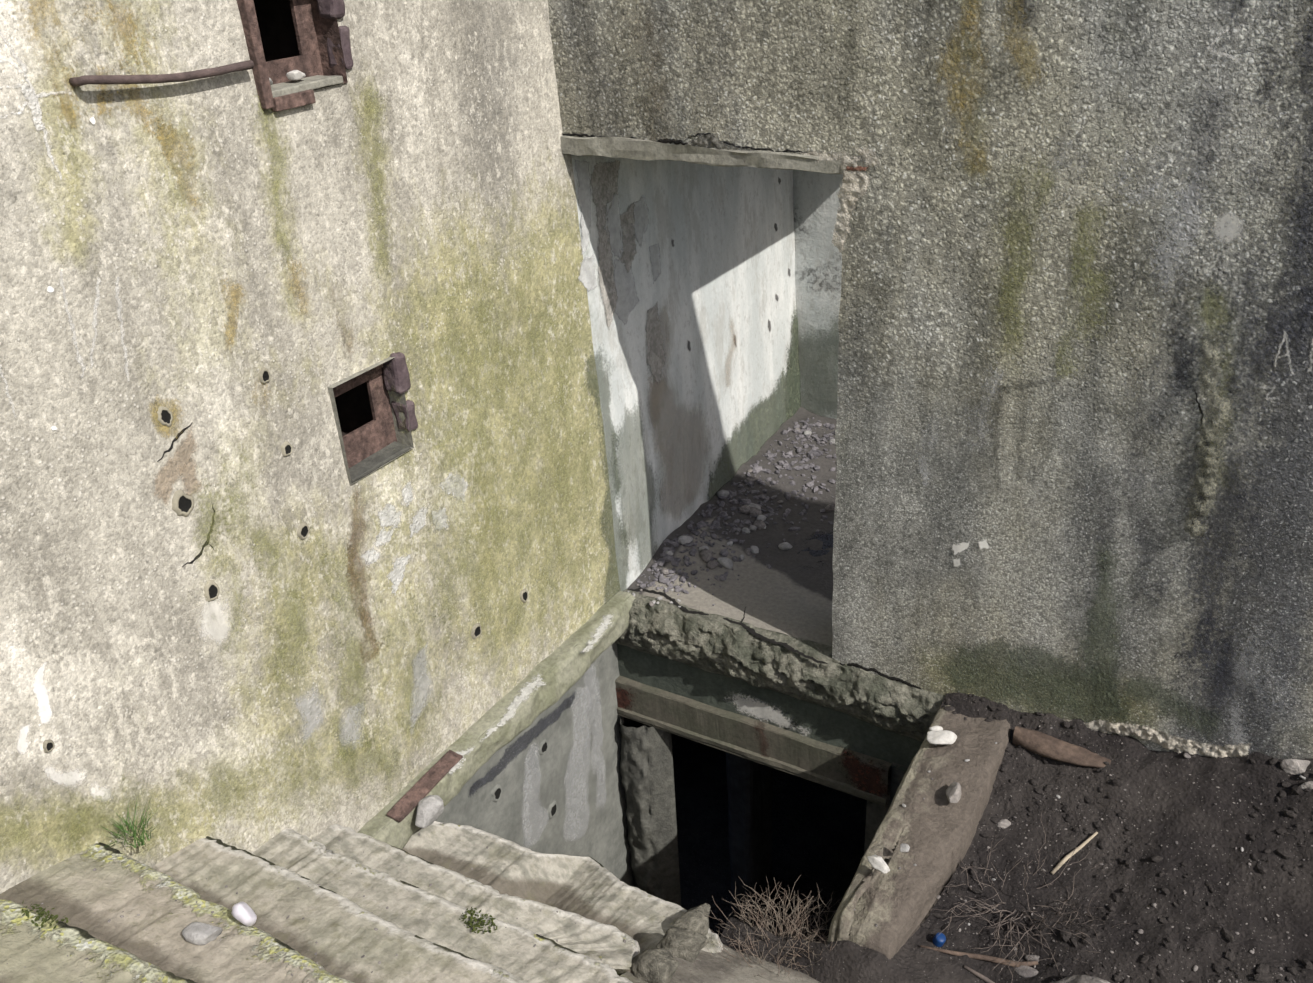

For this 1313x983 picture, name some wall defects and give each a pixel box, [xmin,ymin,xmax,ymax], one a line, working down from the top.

peeling [575,160,674,385]
crack [157,422,193,462]
leakage [707,312,801,501]
leakage [1139,0,1313,745]
crack [182,505,215,567]
leakage [952,540,989,567]
crack [628,588,921,689]
rust [615,687,634,710]
leakage [45,767,111,802]
rust [387,750,463,822]
leakage [469,695,574,795]
rust [839,750,890,804]